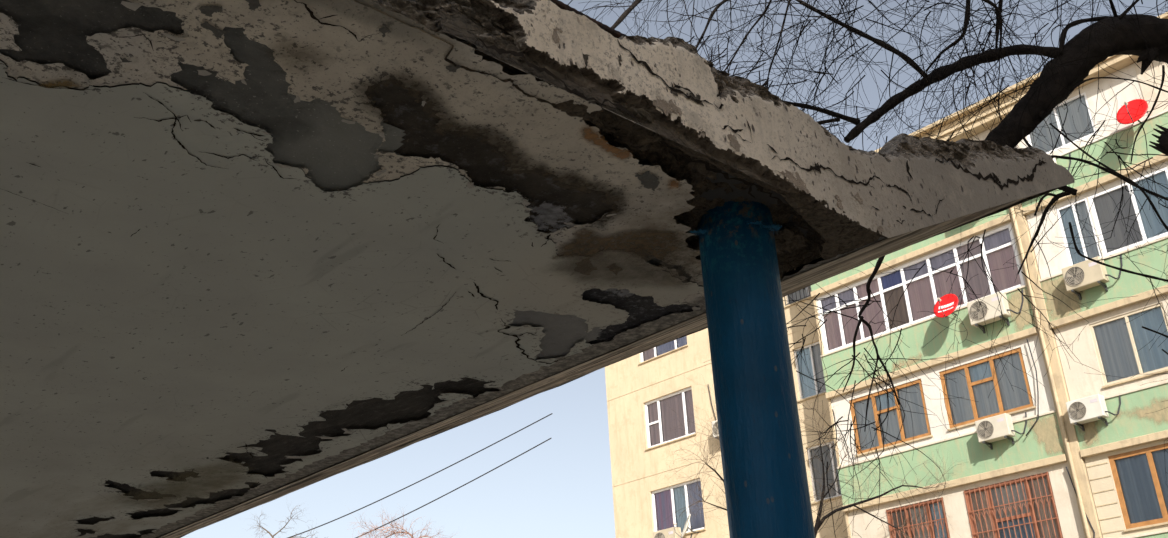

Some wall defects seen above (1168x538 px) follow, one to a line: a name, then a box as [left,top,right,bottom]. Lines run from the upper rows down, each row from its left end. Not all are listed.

peeling [0,0,186,88]
crack [134,92,294,179]
flaking render [246,0,261,10]
peeling [155,5,616,233]
water stain [359,75,681,284]
crack [474,38,640,122]
spalling [354,0,884,283]
crack [660,141,825,258]
crack [617,39,1046,224]
peeling [508,288,701,360]
peeling [73,377,500,538]